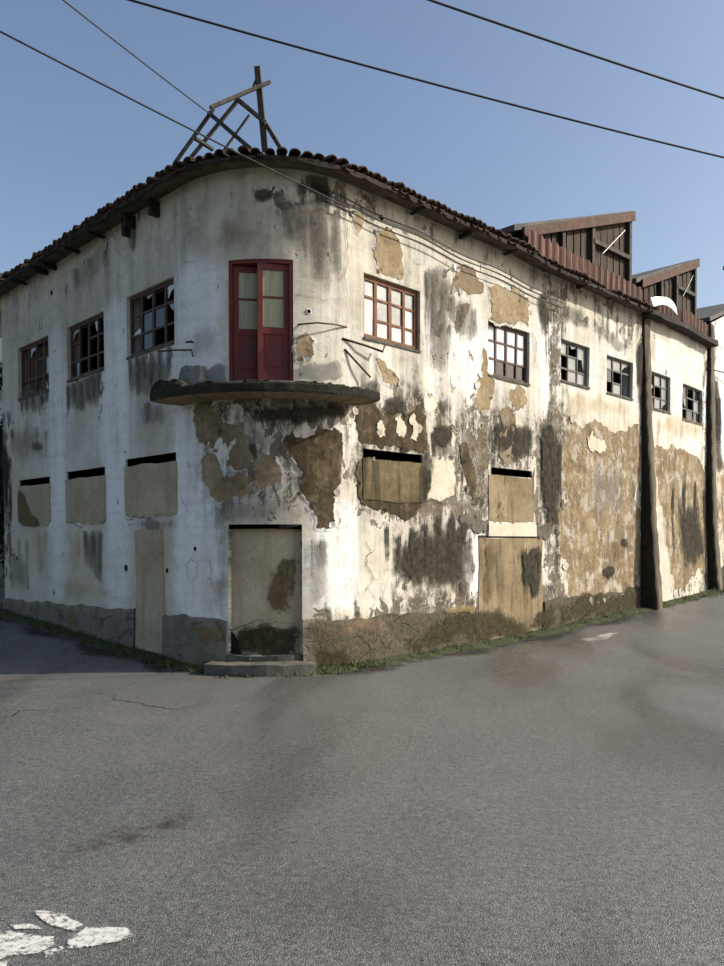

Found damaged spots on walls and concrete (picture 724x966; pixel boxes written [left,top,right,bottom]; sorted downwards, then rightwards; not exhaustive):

water stain [255,188,274,202]
water stain [282,176,341,270]
flaking render [349,207,406,283]
flaking render [448,261,532,329]
flaking render [292,329,317,364]
flaking render [191,392,478,532]
water stain [386,516,473,592]
spalling [460,513,489,534]
water stain [495,420,562,525]
flaking render [536,414,642,606]
flaking render [654,442,708,596]